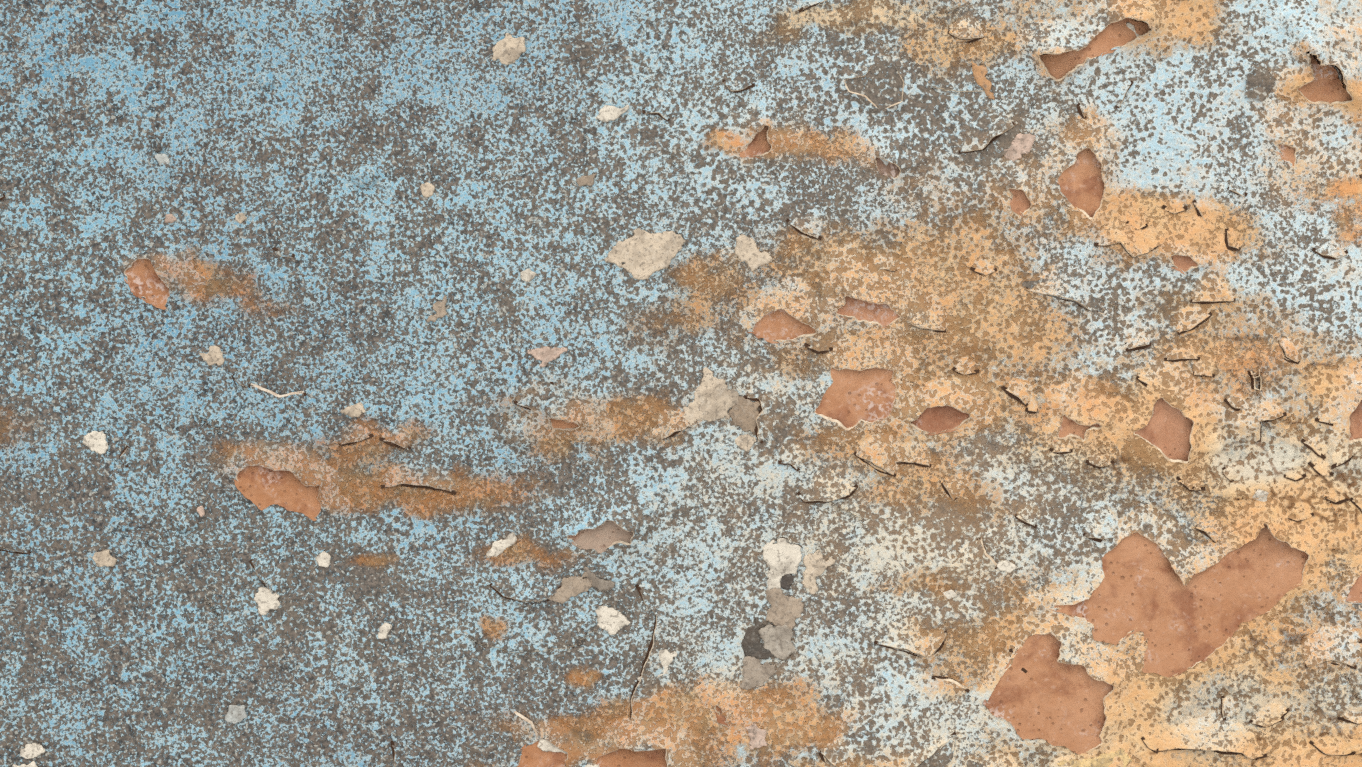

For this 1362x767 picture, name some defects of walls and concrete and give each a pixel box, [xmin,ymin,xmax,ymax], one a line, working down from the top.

peeling [833,0,1183,239]
peeling [1245,0,1362,188]
peeling [105,214,208,319]
peeling [735,234,772,271]
peeling [730,240,996,443]
peeling [1326,353,1362,461]
peeling [214,438,350,529]
peeling [315,551,331,567]
peeling [971,489,1336,767]
peeling [1337,543,1362,615]
peeling [497,717,700,767]